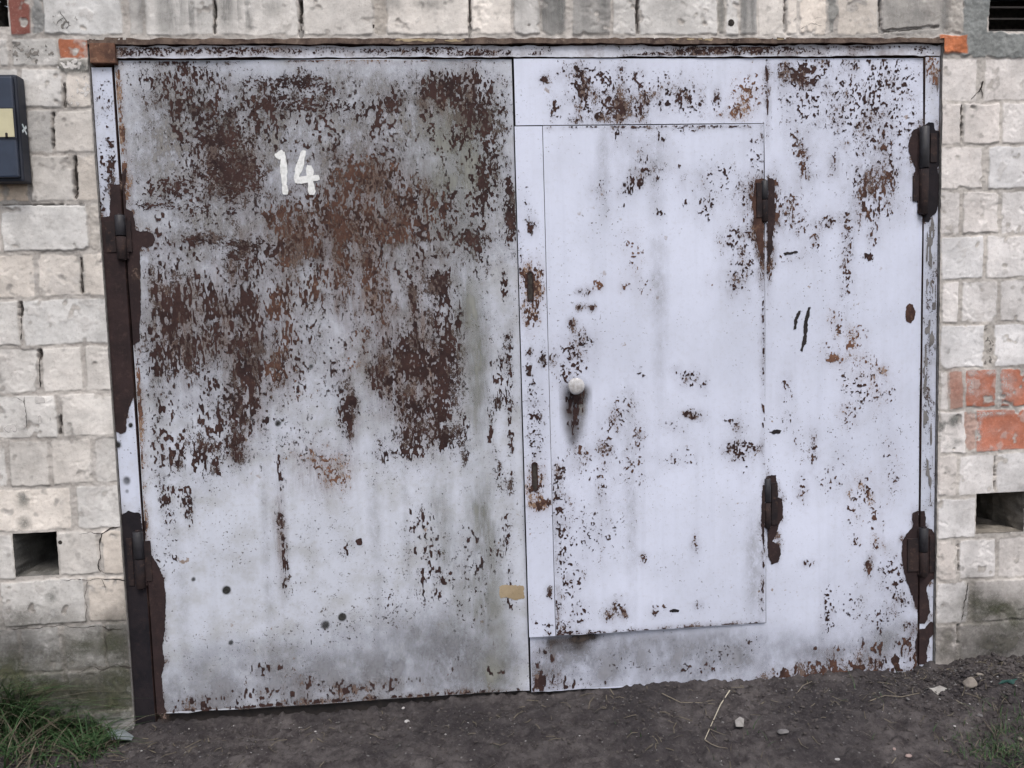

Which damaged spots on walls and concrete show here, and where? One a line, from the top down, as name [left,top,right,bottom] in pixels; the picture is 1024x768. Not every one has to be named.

corrosion [540,56,941,385]
corrosion [91,60,765,713]
corrosion [755,380,917,679]